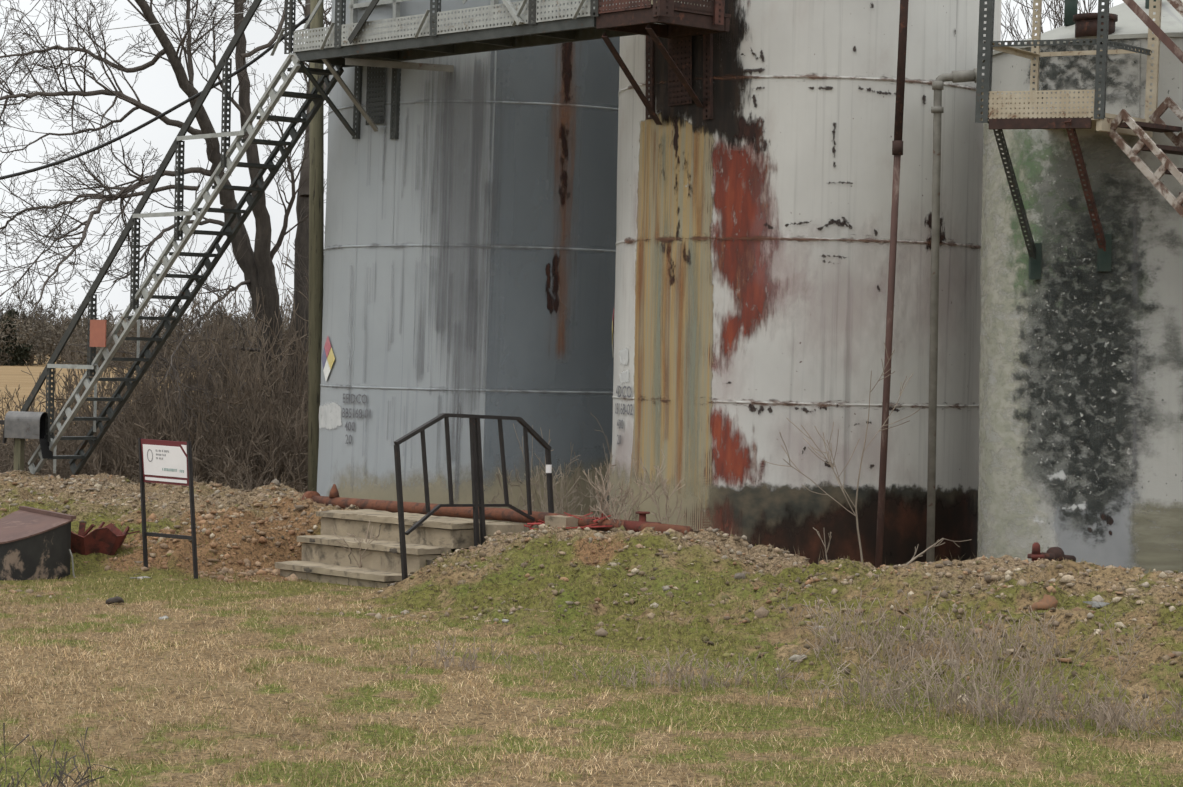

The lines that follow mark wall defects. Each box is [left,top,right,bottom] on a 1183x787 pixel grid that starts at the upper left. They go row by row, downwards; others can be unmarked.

corrosion [559,42,572,208]
damp [737,113,770,153]
corrosion [545,222,569,351]
corrosion [624,141,890,368]
peeling [764,217,852,231]
corrosion [906,212,981,250]
damp [1013,136,1183,569]
corrosion [738,399,849,407]
corrosion [701,397,765,486]
corrosion [684,502,738,536]
corrosion [749,491,978,567]